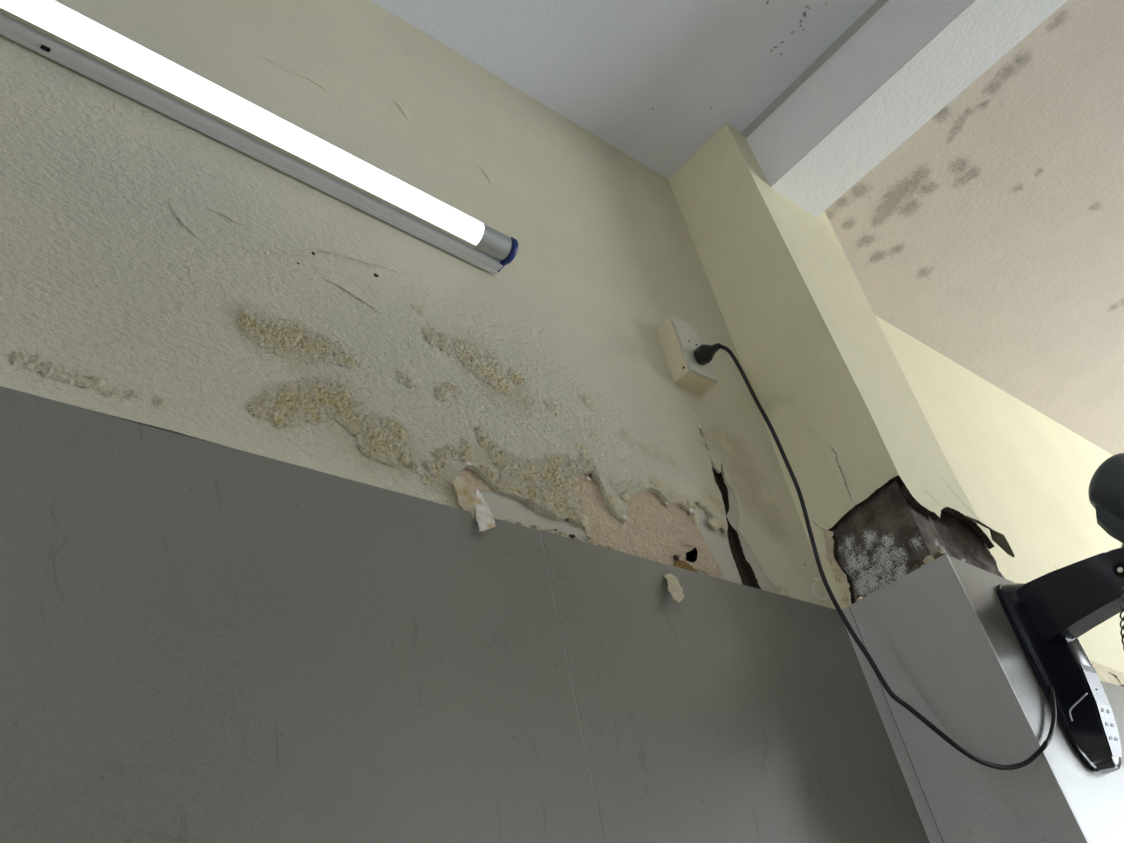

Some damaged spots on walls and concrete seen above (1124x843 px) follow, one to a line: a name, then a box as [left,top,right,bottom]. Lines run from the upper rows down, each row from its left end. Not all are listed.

peeling [421,427,789,603]
spalling [812,475,1015,602]